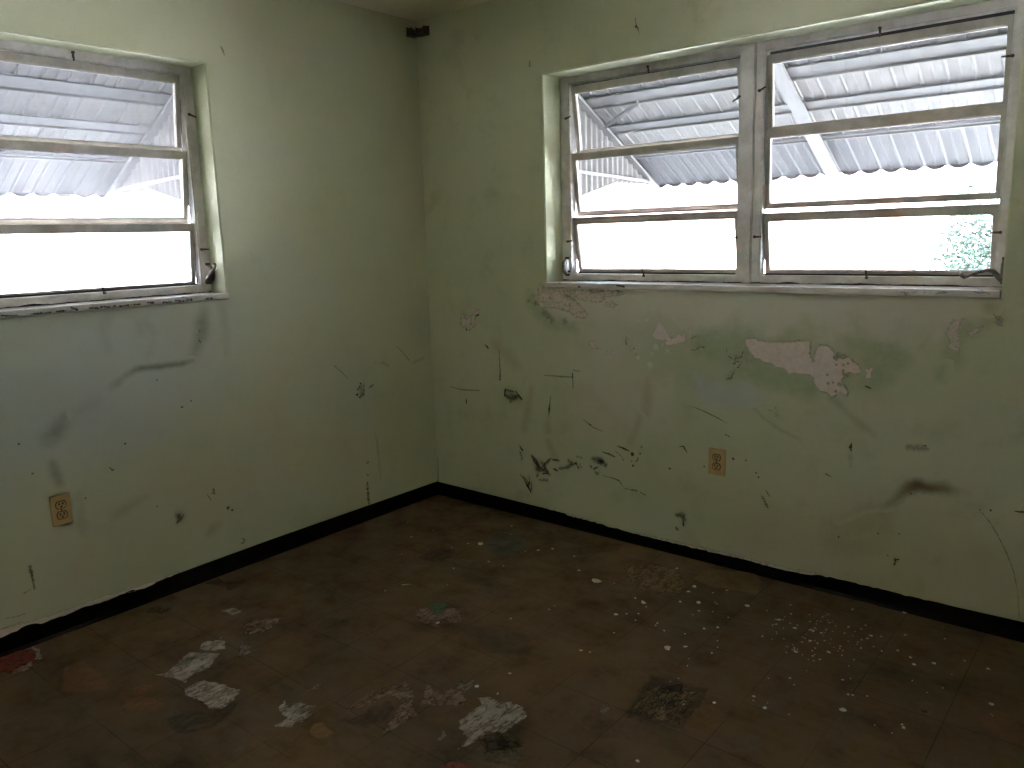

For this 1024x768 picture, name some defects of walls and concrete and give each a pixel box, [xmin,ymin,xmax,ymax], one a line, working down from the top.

peeling [744,336,873,397]
damp [833,475,973,526]